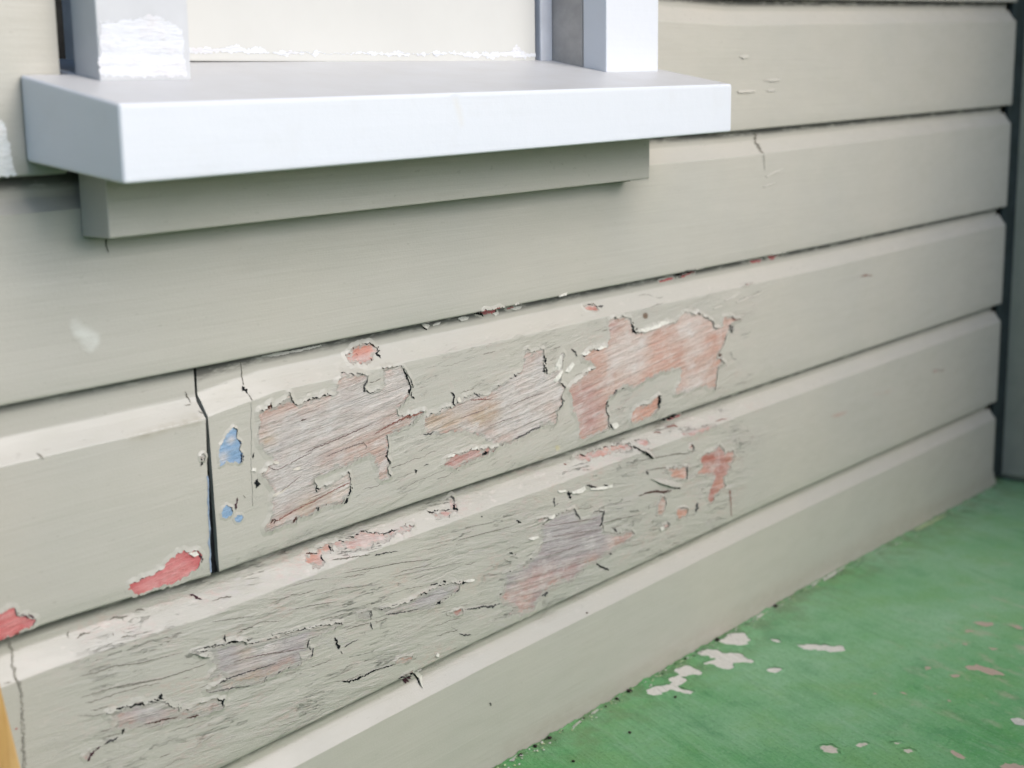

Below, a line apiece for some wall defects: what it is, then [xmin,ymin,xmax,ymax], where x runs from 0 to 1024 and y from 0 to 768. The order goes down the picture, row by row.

peeling [197,301,742,537]
peeling [124,545,206,598]
peeling [300,491,461,574]
peeling [497,484,640,621]
peeling [0,602,40,640]
peeling [377,578,464,620]
peeling [101,617,345,734]
peeling [343,653,424,688]
spalling [640,631,851,699]
spalling [946,664,1007,678]
spalling [815,739,920,756]